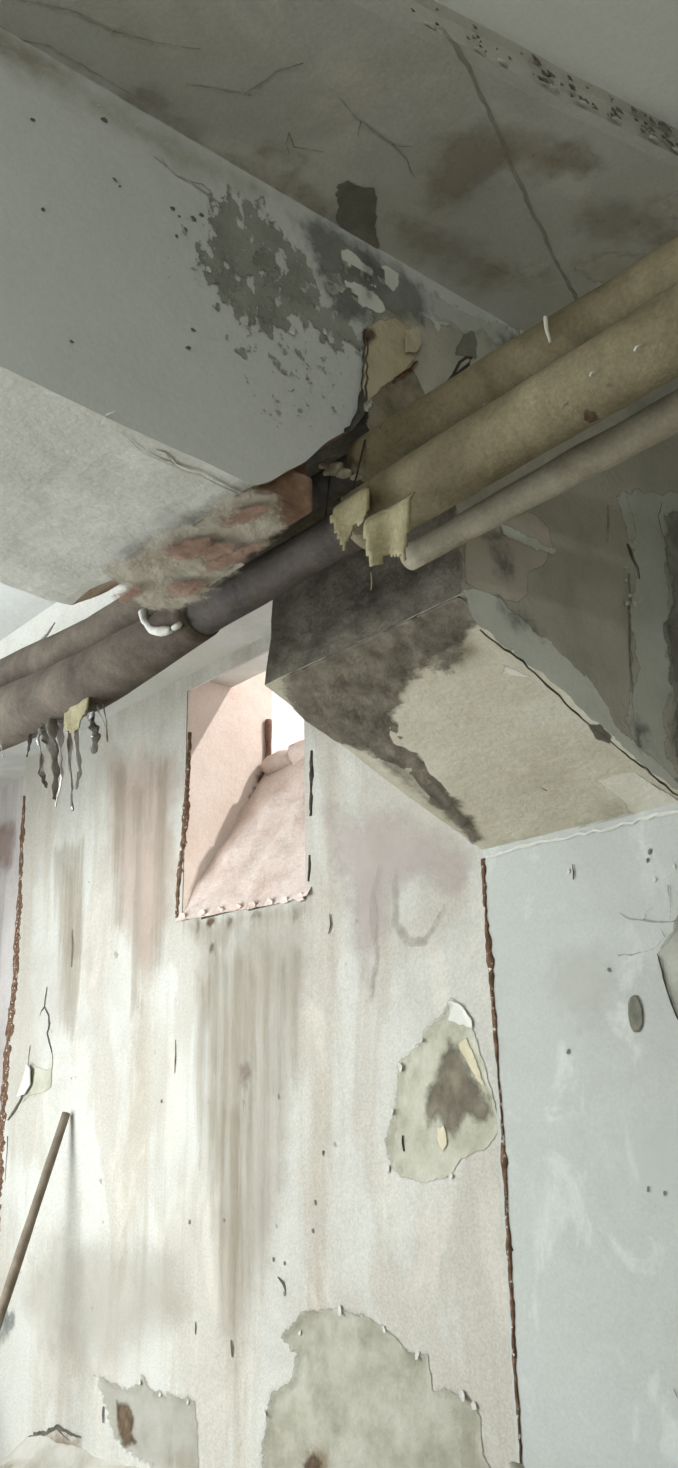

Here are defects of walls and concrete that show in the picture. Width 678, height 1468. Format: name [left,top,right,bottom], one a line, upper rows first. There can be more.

spalling [466,24,678,153]
peeling [170,181,523,433]
flaking render [456,400,647,515]
spalling [103,462,312,636]
flaking render [283,434,678,844]
corrosion [0,796,26,1222]
flaking render [384,998,498,1183]
corrosion [481,858,522,1464]
flaking render [657,922,678,1019]
flaking render [98,1375,199,1468]
flaking render [261,1305,490,1468]